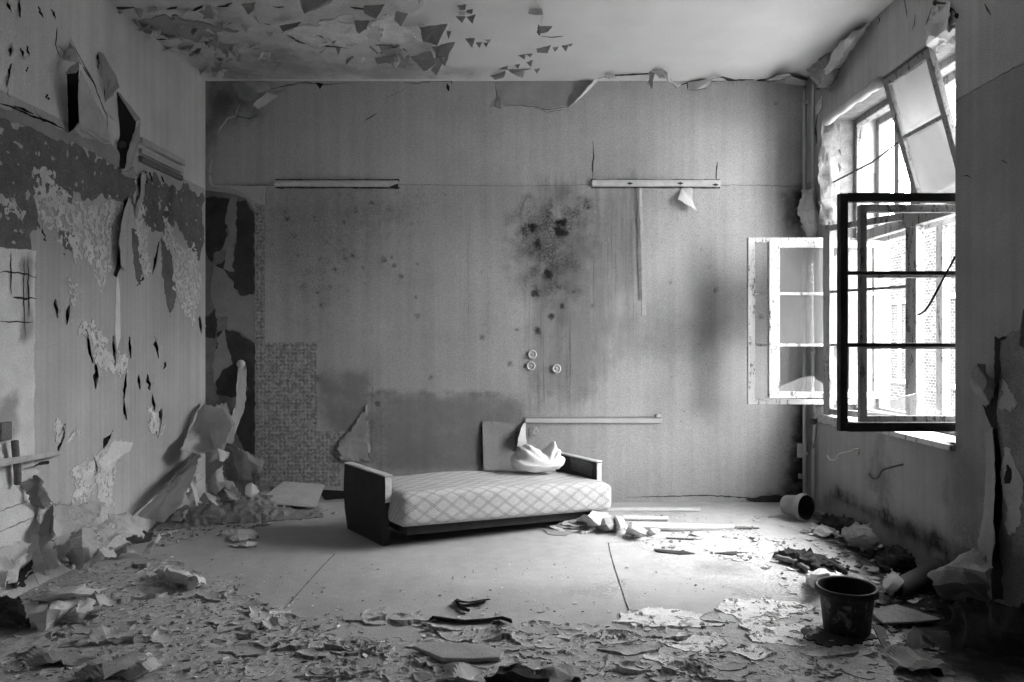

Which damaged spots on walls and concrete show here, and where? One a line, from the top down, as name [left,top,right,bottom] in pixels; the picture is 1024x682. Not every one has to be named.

peeling [108,0,491,109]
peeling [528,9,552,34]
peeling [490,43,616,112]
peeling [767,23,885,225]
peeling [0,41,265,596]
leakage [523,194,594,381]
peeling [337,405,371,461]
peeling [969,309,1024,607]